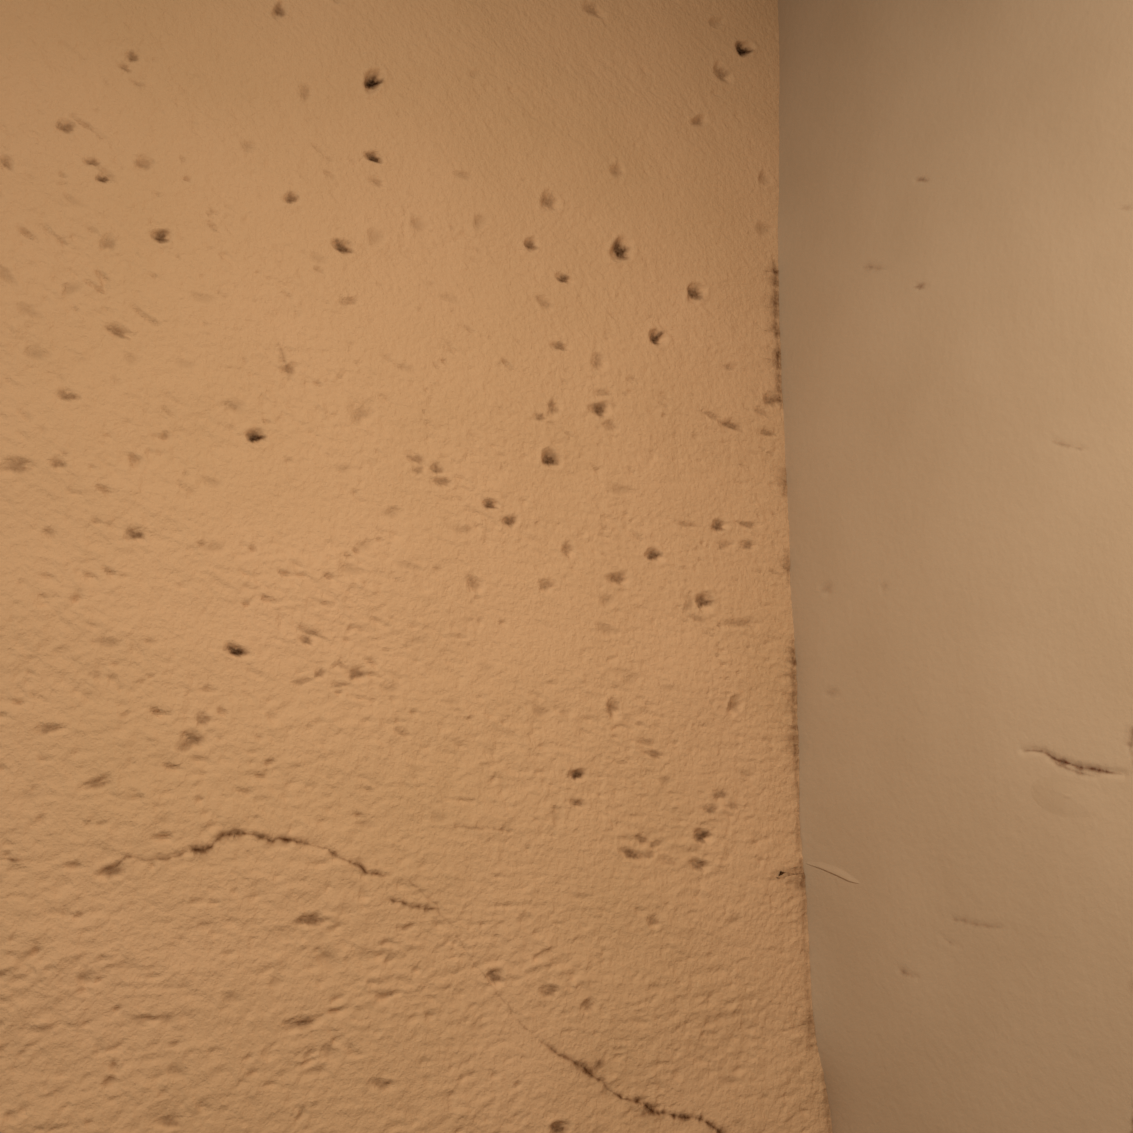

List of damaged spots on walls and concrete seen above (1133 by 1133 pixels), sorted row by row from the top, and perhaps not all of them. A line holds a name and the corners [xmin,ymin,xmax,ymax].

crack [1047,753,1112,773]
crack [162,831,378,874]
crack [563,1056,721,1133]